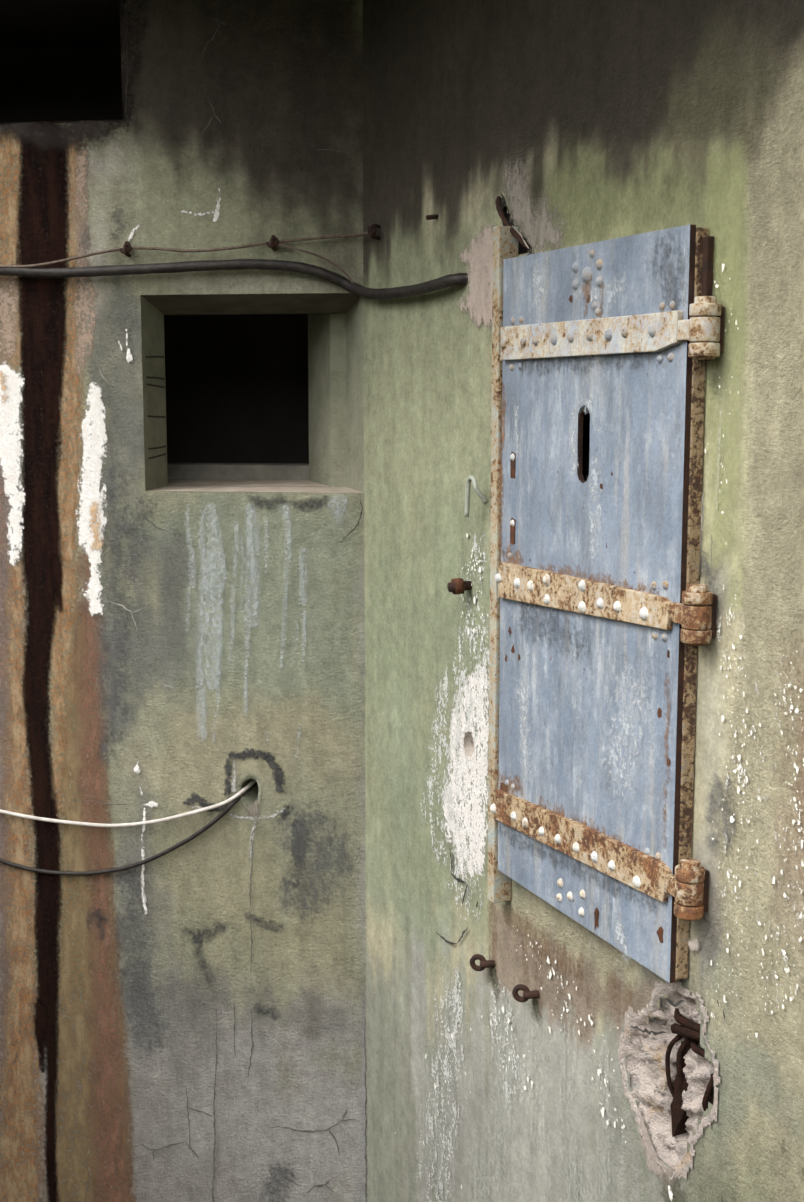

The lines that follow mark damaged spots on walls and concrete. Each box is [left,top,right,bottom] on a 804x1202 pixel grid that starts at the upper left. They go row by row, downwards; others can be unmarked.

peeling [459,159,565,328]
corrosion [0,121,134,1202]
leakage [189,497,347,738]
peeling [420,533,489,921]
spalling [513,585,804,1191]
crack [141,1006,279,1202]
crack [270,1018,368,1202]